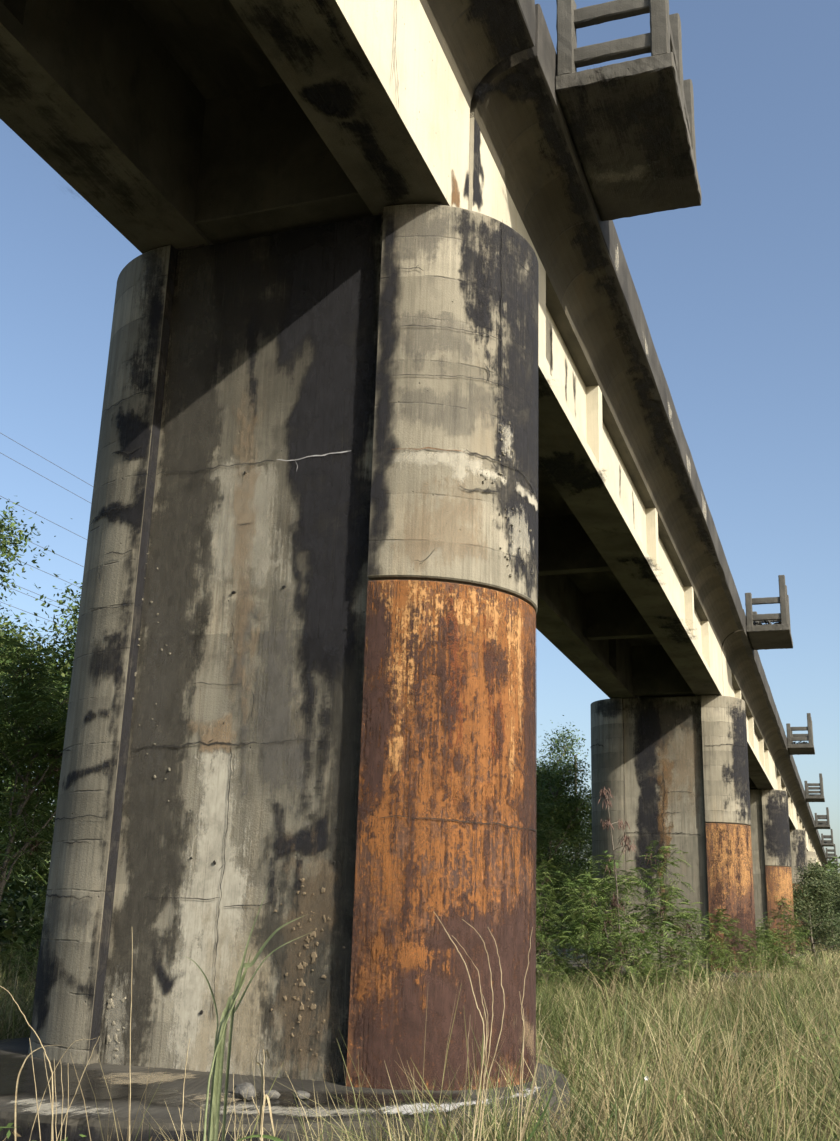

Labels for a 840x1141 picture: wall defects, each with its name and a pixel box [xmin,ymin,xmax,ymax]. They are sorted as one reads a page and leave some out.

damp [250,0,322,70]
damp [299,0,408,202]
damp [455,0,720,599]
crack [157,451,349,486]
damp [0,214,539,1114]
corrosion [347,580,537,1091]
damp [598,697,702,926]
corrosion [706,823,793,973]
damp [0,1119,285,1141]